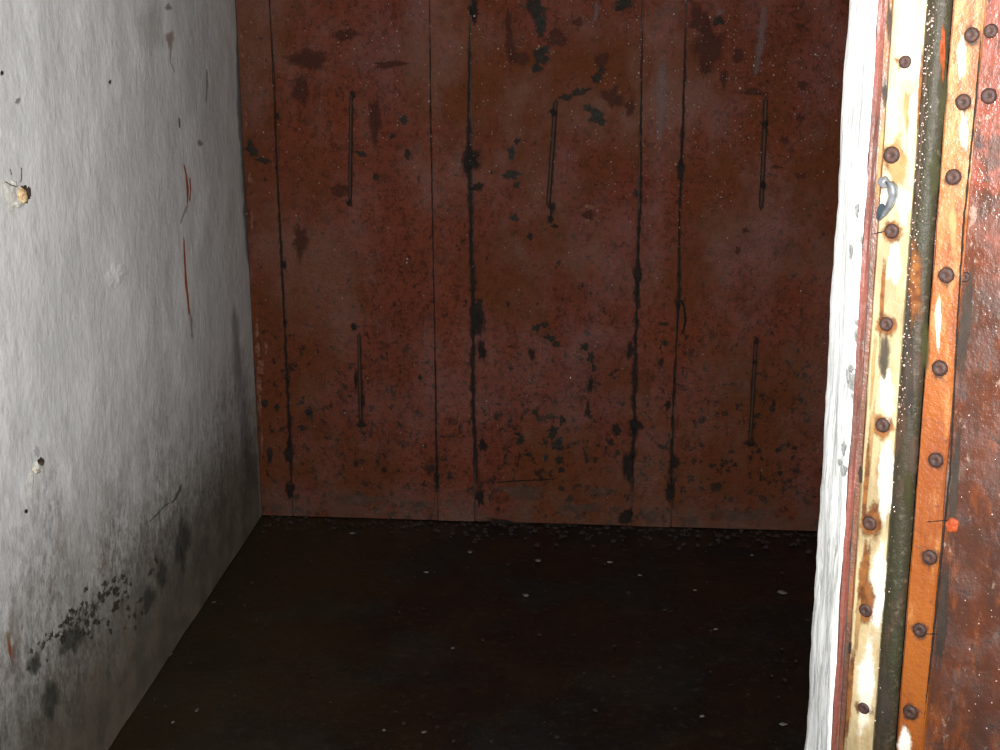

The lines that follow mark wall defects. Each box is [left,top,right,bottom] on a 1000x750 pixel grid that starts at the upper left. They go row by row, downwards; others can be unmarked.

spalling [3,168,31,214]
peeling [27,574,147,670]
leakage [23,448,280,750]
corrosion [272,41,295,497]
corrosion [429,38,439,488]
corrosion [462,39,488,505]
corrosion [613,34,643,483]
corrosion [665,45,686,502]
corrosion [838,0,903,750]
corrosion [960,106,971,147]